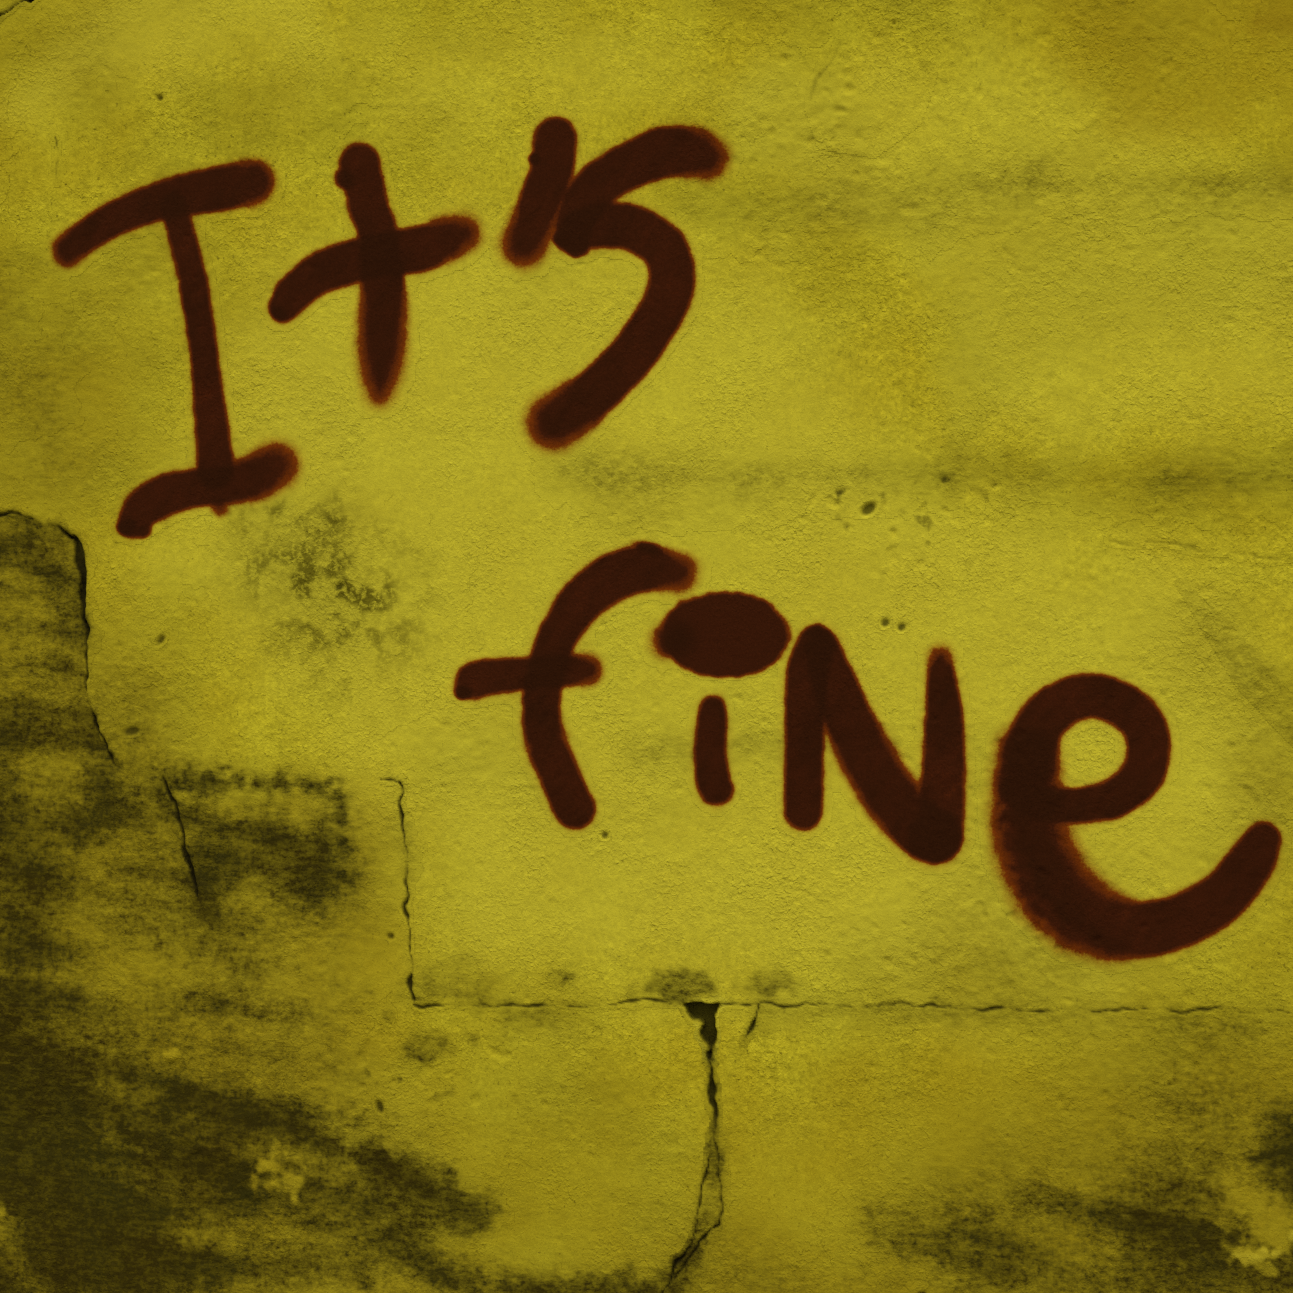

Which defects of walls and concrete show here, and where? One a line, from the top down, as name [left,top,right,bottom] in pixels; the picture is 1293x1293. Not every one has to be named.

crack [0,0,41,23]
crack [0,507,126,774]
damp [181,473,485,736]
crack [156,773,203,904]
damp [0,518,740,1293]
crack [374,773,1293,1293]
damp [620,959,1293,1293]